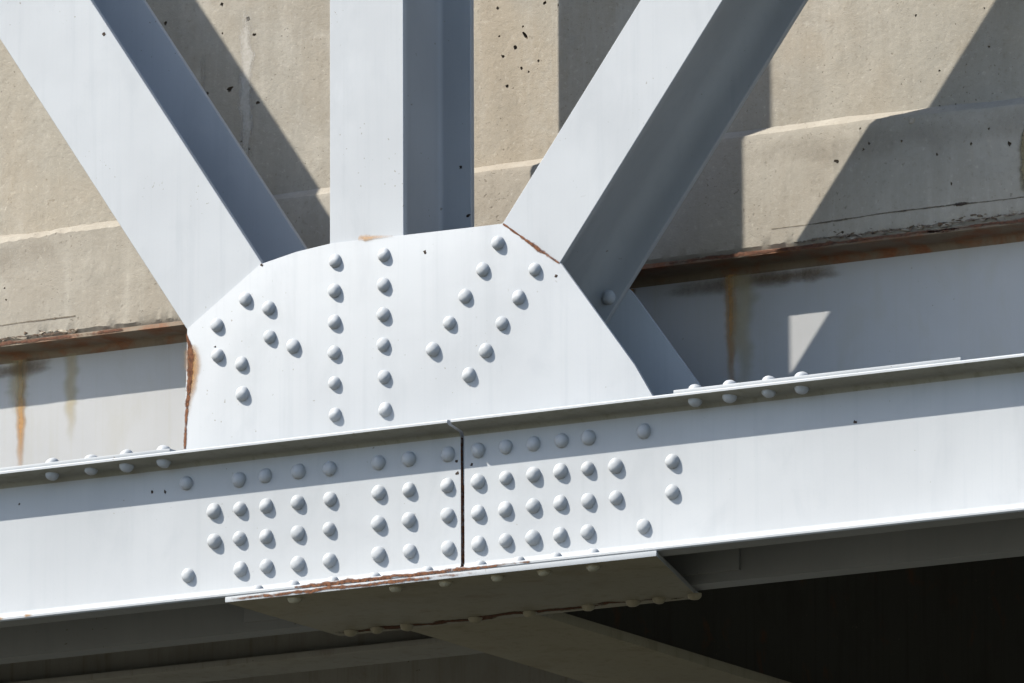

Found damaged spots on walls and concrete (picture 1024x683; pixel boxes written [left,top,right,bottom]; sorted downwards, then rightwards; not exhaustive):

corrosion [669,218,1024,264]
corrosion [13,360,34,449]
corrosion [184,333,198,449]
corrosion [237,438,505,599]